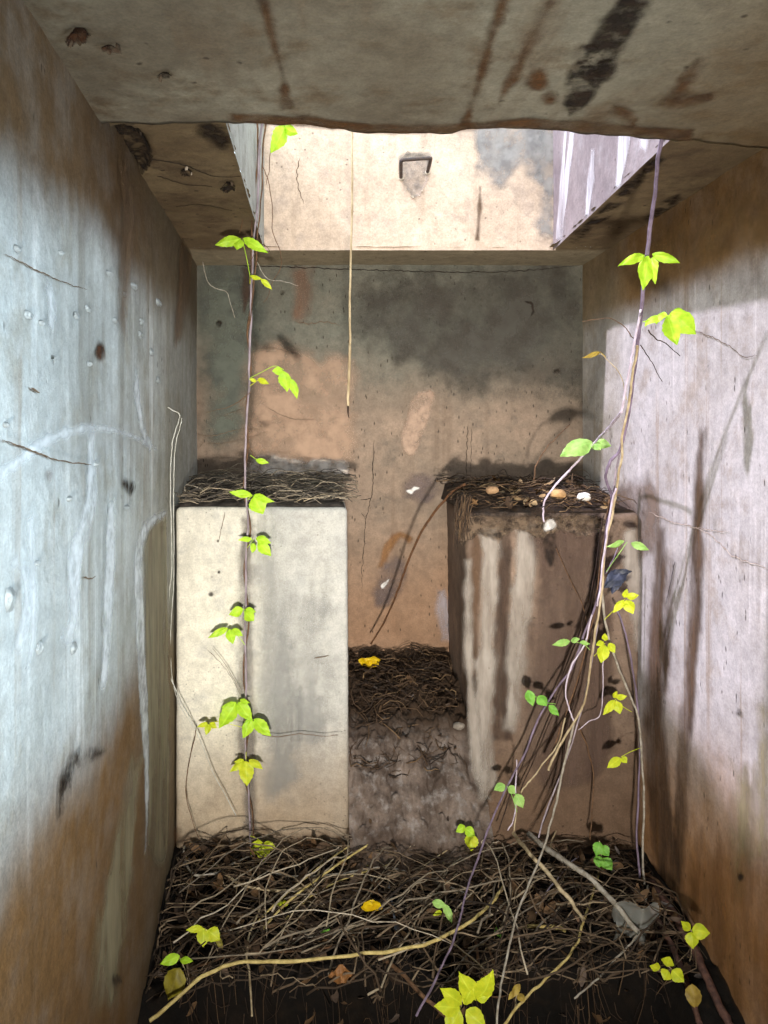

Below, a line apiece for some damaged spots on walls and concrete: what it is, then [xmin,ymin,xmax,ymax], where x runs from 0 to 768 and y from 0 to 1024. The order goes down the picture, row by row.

corrosion [478,0,505,81]
corrosion [503,47,554,104]
spalling [114,124,152,175]
leakage [232,0,694,238]
crack [5,254,87,290]
crack [3,440,91,465]
crack [361,443,374,582]
leakage [460,509,612,798]
corrosion [58,750,102,817]